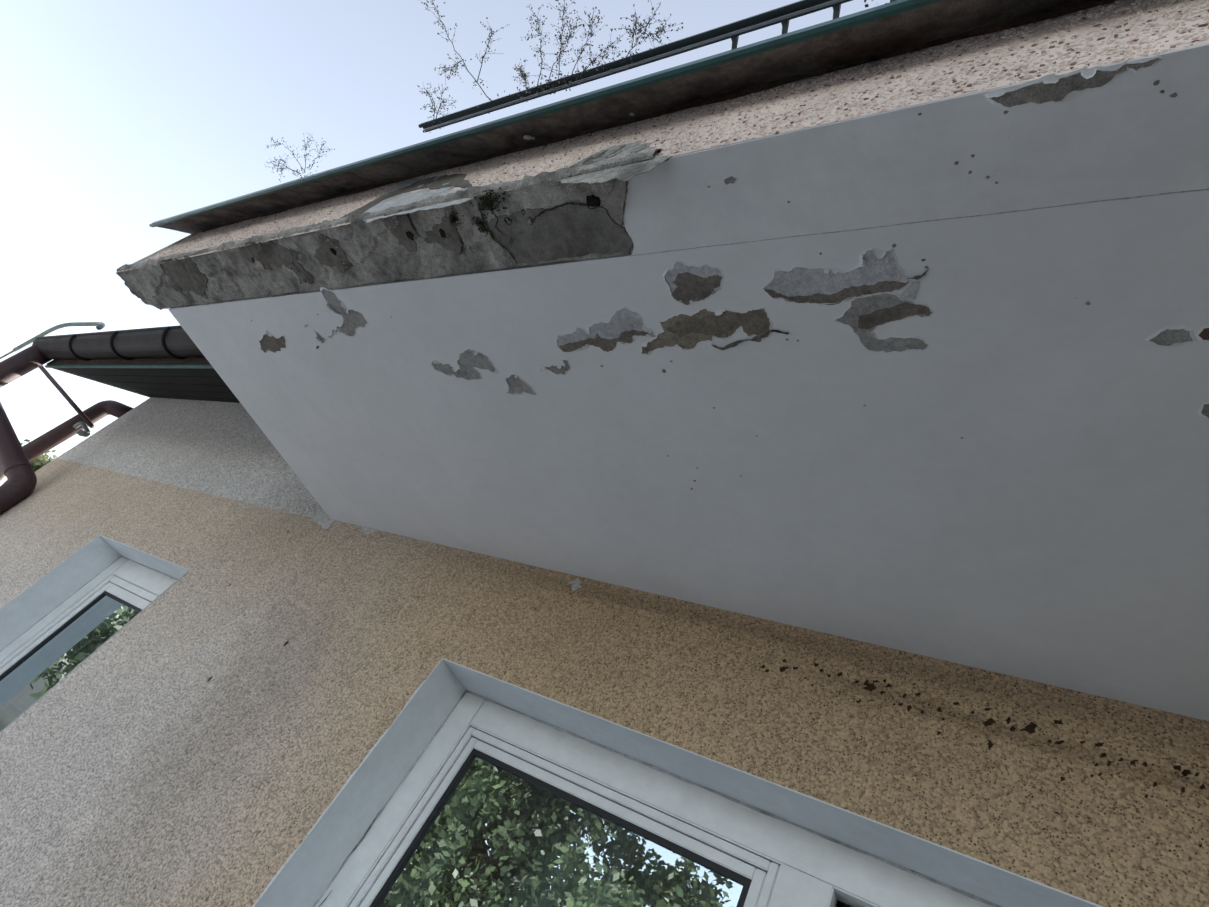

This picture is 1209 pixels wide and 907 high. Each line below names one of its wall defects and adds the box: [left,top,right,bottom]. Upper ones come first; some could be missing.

peeling [983,55,1177,114]
spalling [116,140,672,349]
crack [478,206,517,264]
crack [532,202,593,224]
peeling [258,330,287,354]
peeling [540,244,934,376]
peeling [1145,325,1209,348]
peeling [431,348,537,396]